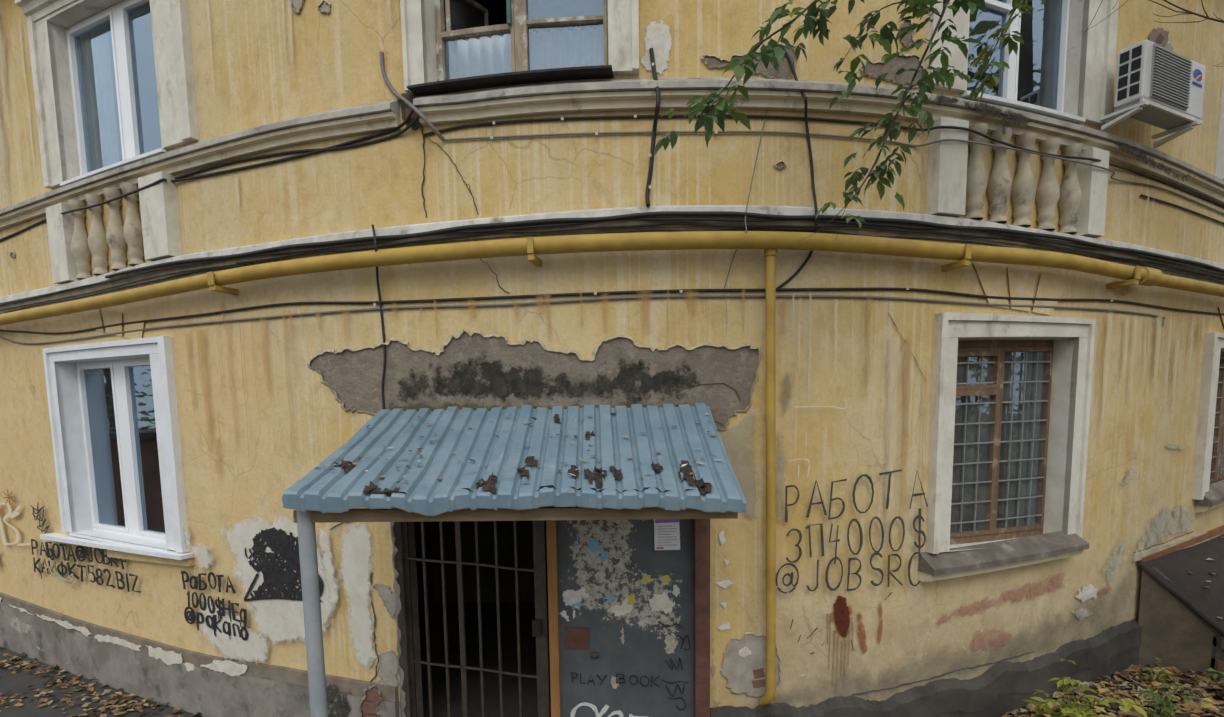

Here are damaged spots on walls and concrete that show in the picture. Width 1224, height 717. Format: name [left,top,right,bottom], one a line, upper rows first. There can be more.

spalling [307,328,762,432]
peeling [0,597,248,676]
peeling [339,522,399,717]
spalling [711,530,782,698]
rust [833,595,883,653]
peeling [937,573,1065,625]
peeling [1071,505,1192,620]